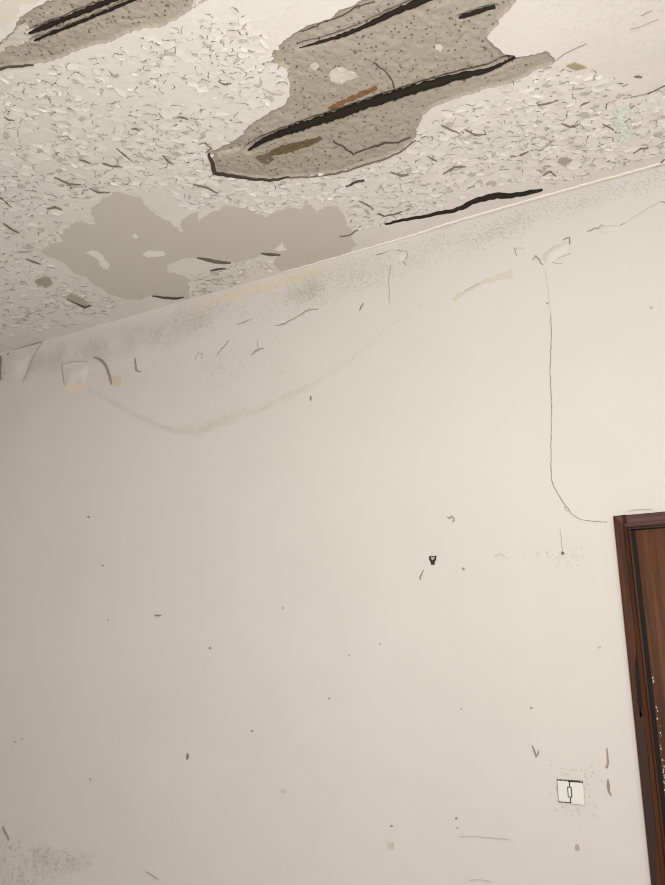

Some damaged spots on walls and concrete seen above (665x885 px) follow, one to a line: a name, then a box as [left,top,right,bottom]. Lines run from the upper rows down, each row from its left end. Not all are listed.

spalling [0,0,665,336]
crack [376,250,408,303]
crack [378,189,543,225]
crack [514,201,665,551]